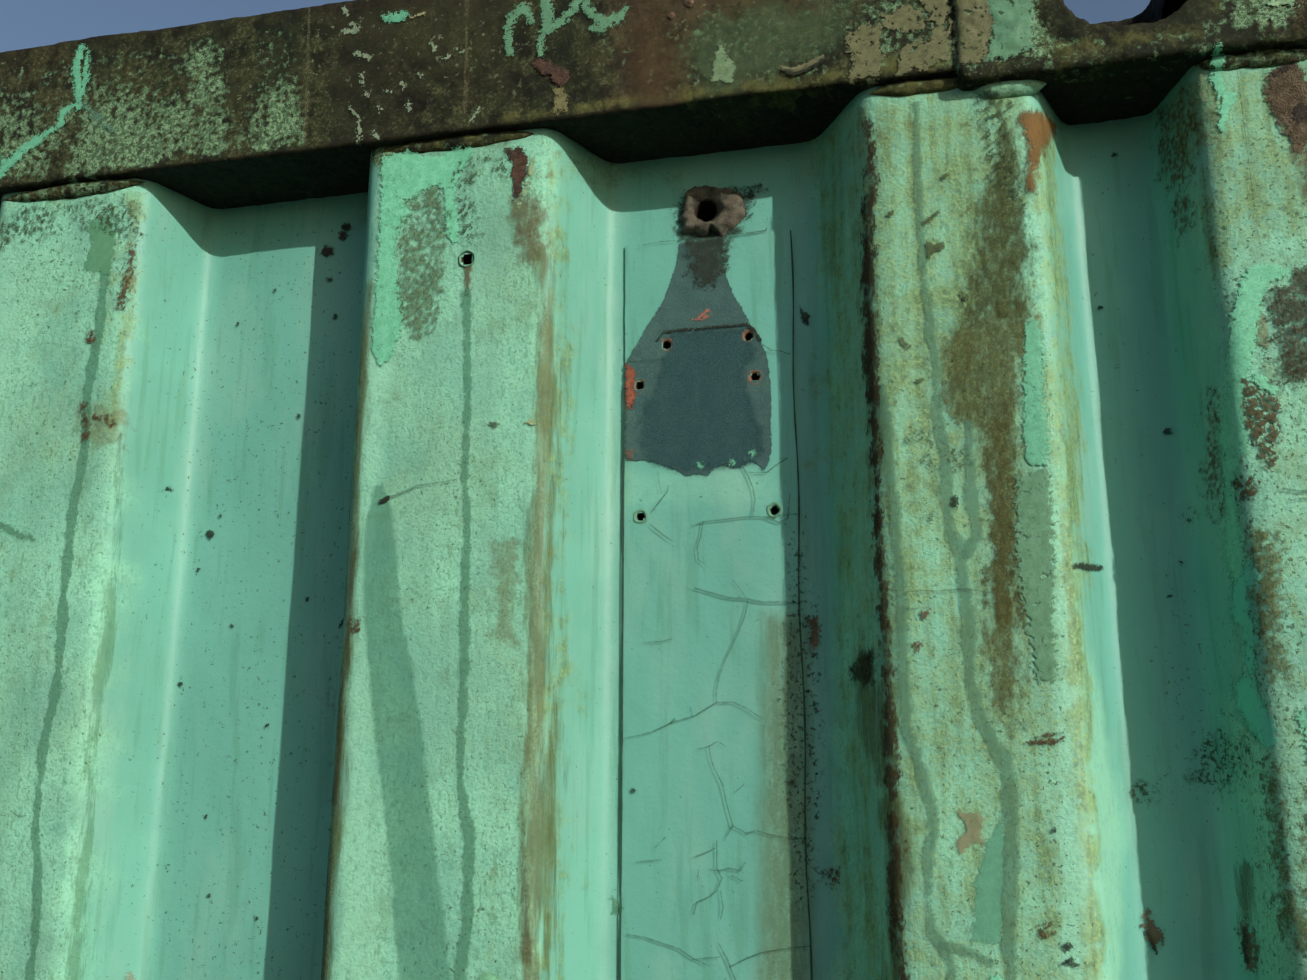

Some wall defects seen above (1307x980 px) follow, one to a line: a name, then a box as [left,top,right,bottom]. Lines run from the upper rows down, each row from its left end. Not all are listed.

peeling [0,43,115,179]
peeling [844,0,1038,87]
peeling [1262,0,1307,20]
water stain [0,197,143,980]
corrosion [79,402,117,442]
corrosion [321,284,372,980]
peeling [625,239,772,476]
corrosion [807,615,822,657]
corrosion [858,116,911,980]
water stain [877,101,1026,980]